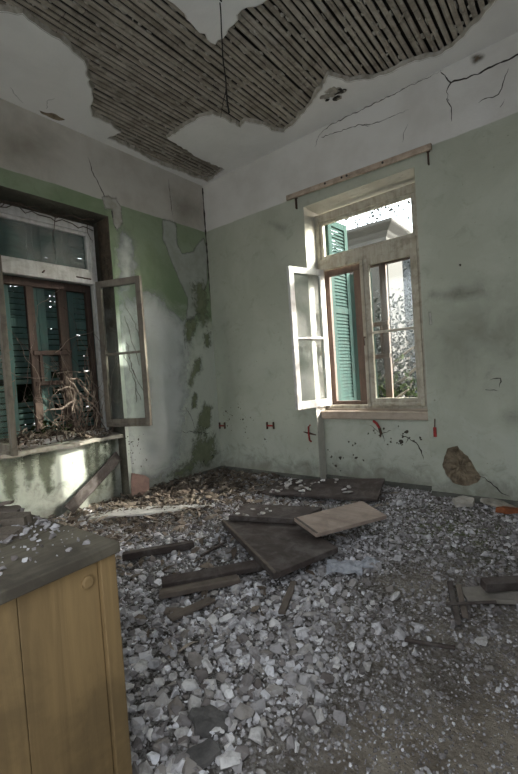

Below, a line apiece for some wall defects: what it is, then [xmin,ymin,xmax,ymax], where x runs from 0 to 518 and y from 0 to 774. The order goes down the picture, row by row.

flaking render [0,0,497,182]
crack [316,54,518,144]
peeling [162,220,207,320]
water stain [121,282,216,477]
water stain [2,452,54,500]
water stain [85,439,115,478]
spalling [442,446,481,486]